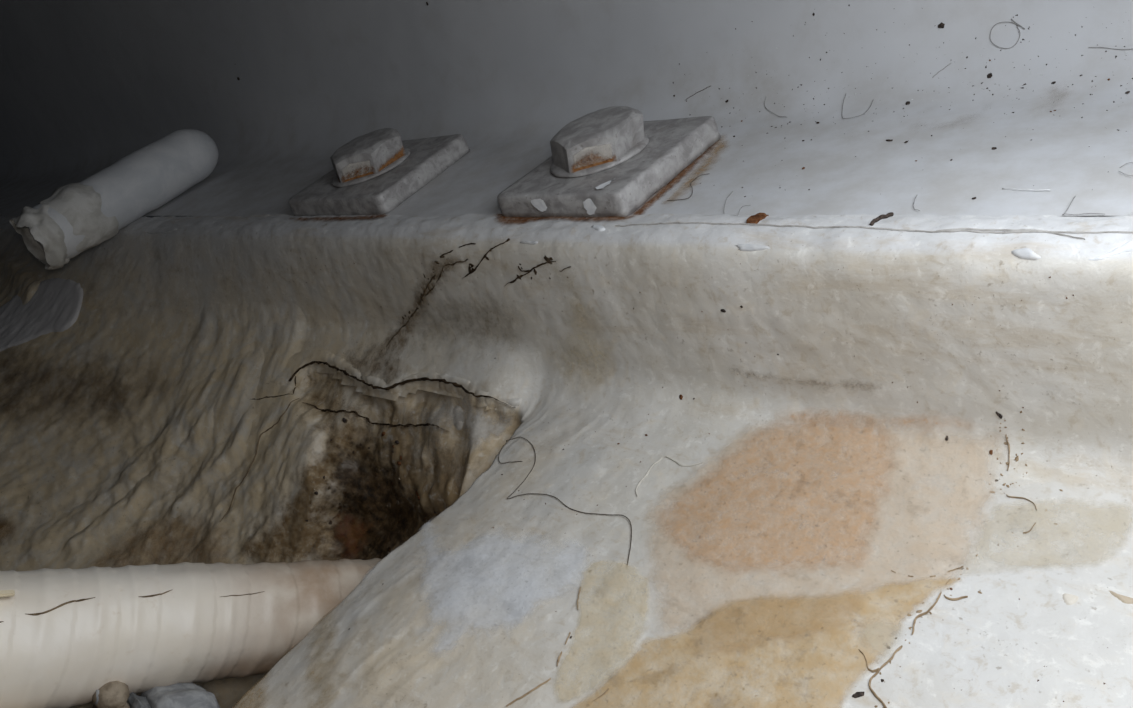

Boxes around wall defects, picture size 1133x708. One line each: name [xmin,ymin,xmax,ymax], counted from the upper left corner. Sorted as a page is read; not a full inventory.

rust [338,148,405,182]
rust [498,143,724,224]
crack [386,238,571,350]
water stain [566,416,992,708]